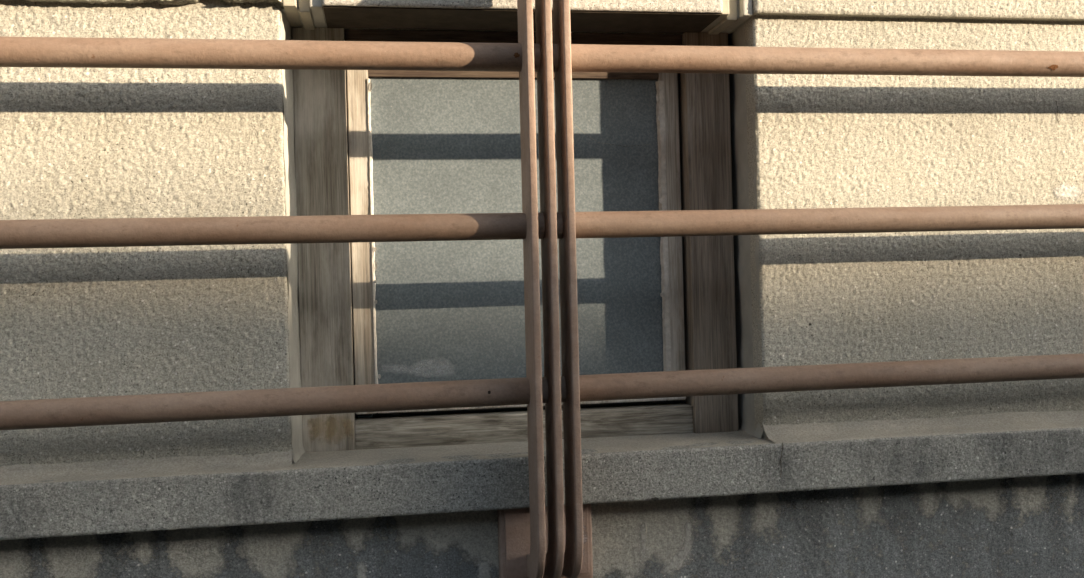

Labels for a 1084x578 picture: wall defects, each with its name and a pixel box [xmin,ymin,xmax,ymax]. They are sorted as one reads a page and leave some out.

damp [26,538,54,578]
damp [95,530,183,578]
damp [198,525,263,578]
damp [287,516,499,578]
damp [605,473,1084,578]